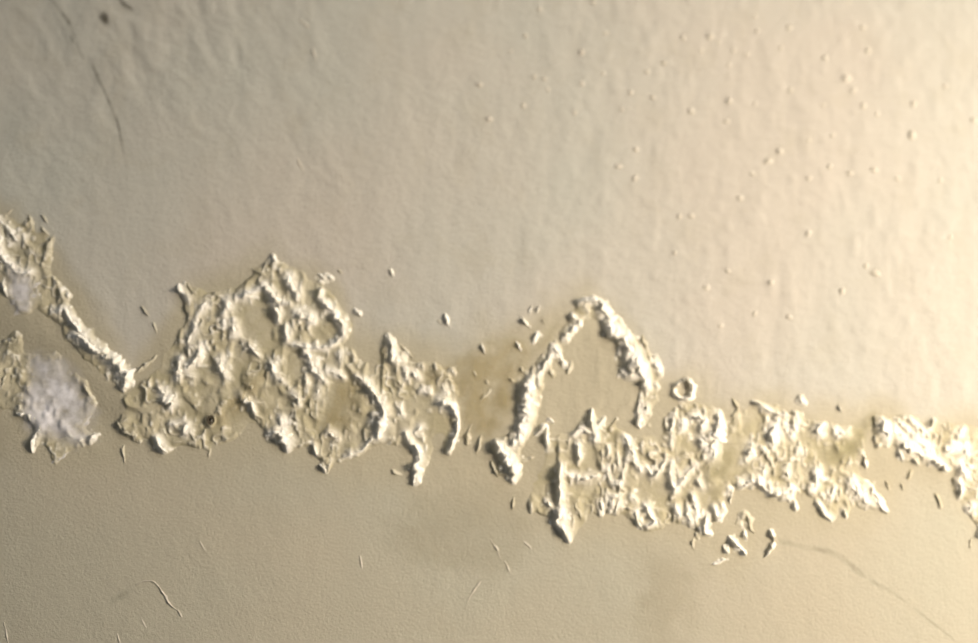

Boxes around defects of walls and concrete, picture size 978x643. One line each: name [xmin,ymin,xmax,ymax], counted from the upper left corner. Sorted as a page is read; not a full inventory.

flaking render [0,209,978,565]